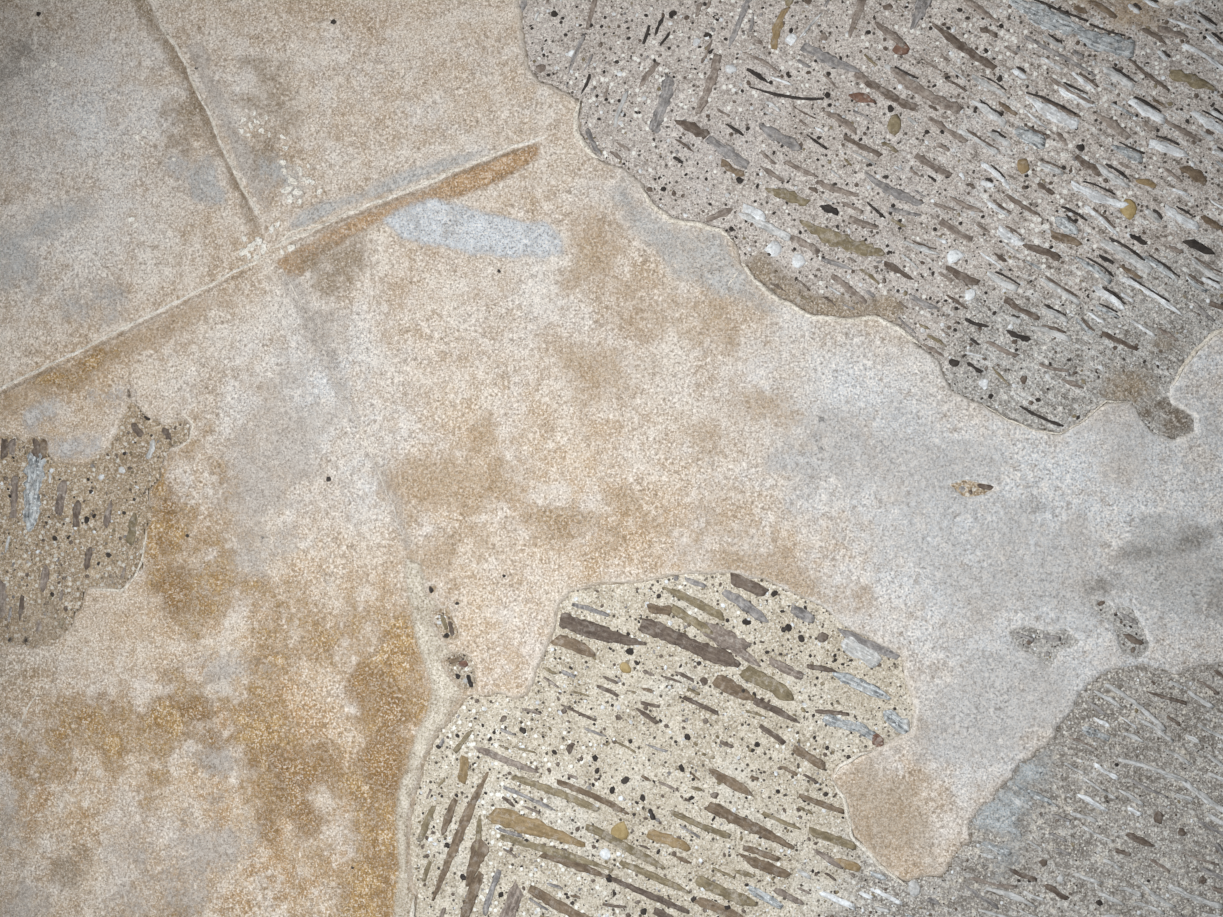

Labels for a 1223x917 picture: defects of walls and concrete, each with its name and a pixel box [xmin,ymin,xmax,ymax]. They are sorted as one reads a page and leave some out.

crack [154,16,261,219]
crack [0,136,547,540]
spalling [519,0,1223,439]
spalling [0,403,194,648]
spalling [395,561,1223,917]